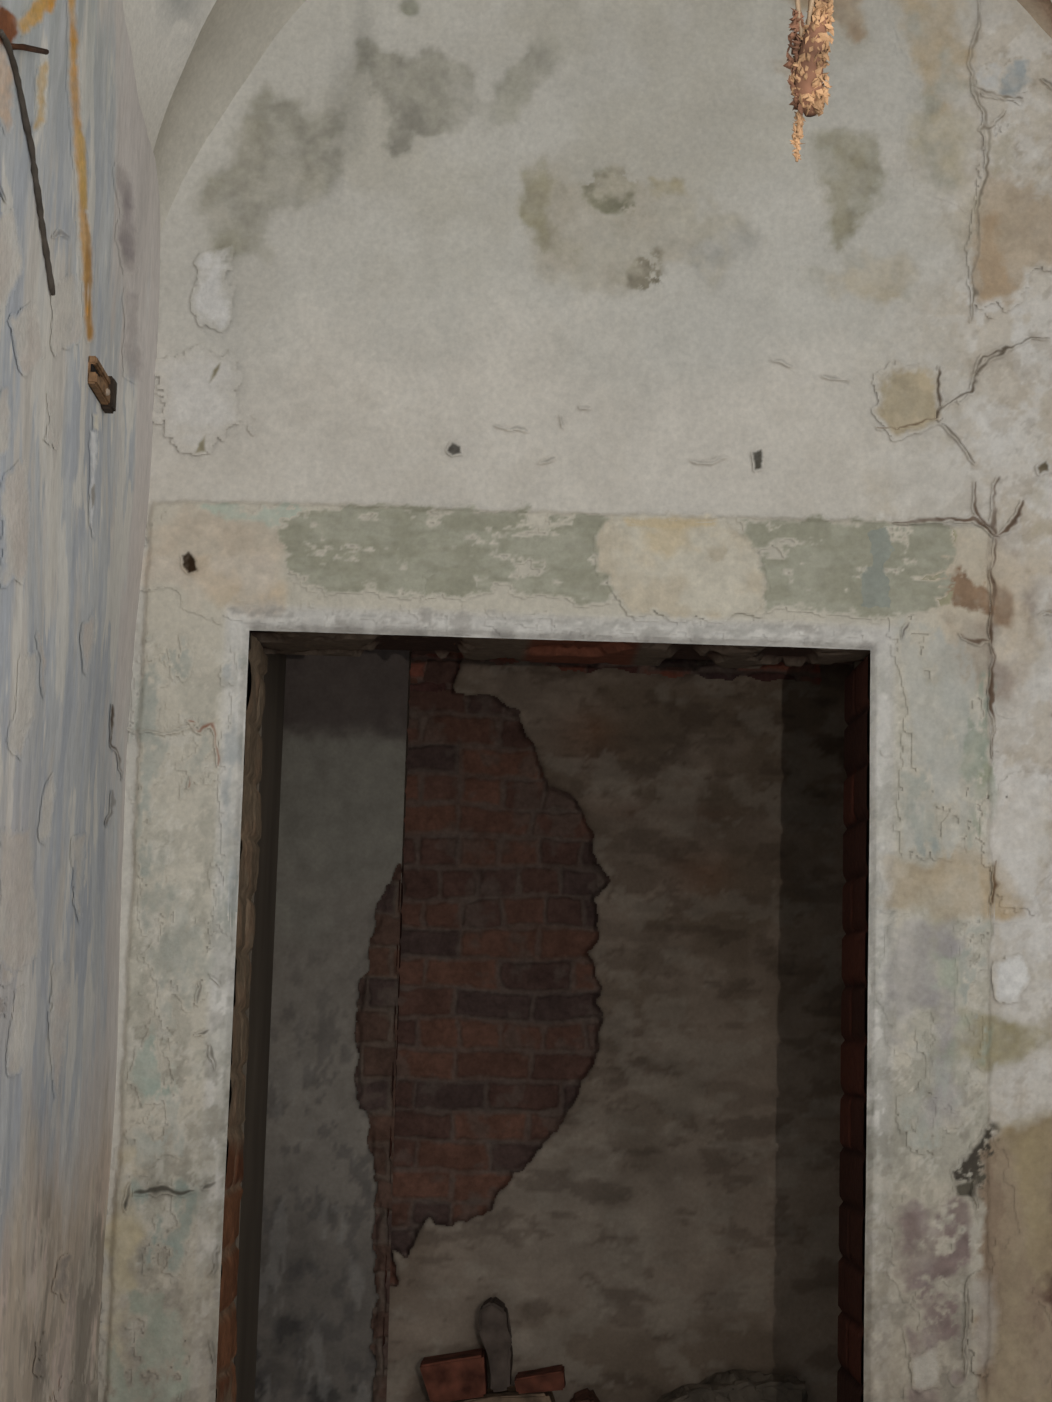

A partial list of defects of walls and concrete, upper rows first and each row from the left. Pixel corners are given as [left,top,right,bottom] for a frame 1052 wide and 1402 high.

rust [0,0,96,343]
damp [179,29,572,272]
damp [395,0,429,19]
crack [967,0,1052,322]
crack [892,335,1050,759]
flaking render [354,651,822,1402]
peeling [197,499,1052,1155]
crack [990,860,1001,905]
flaking render [909,1347,944,1393]
flaking render [965,1269,1003,1377]